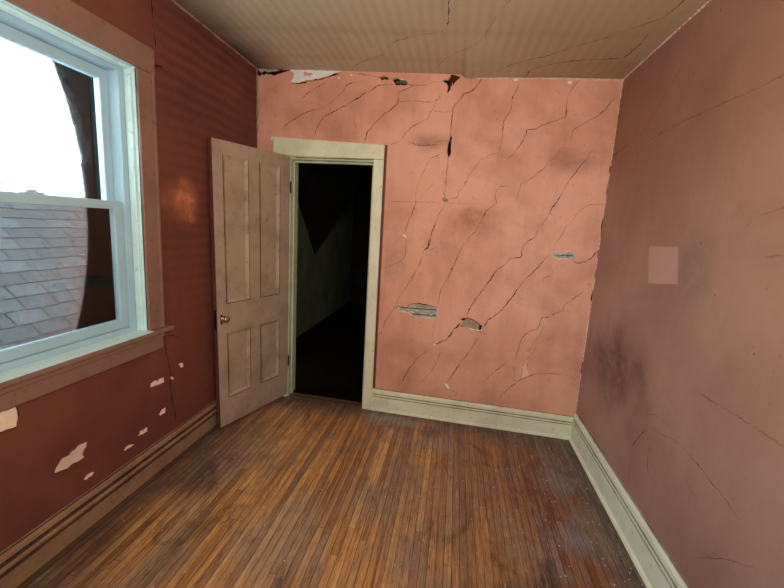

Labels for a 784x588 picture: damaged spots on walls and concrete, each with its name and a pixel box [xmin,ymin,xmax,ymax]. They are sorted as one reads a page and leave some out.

peeling [257,69,352,84]
crack [281,0,684,399]
spalling [552,251,574,260]
spalling [396,303,438,319]
spalling [459,318,484,334]
peeling [0,406,19,433]
peeling [54,441,87,474]